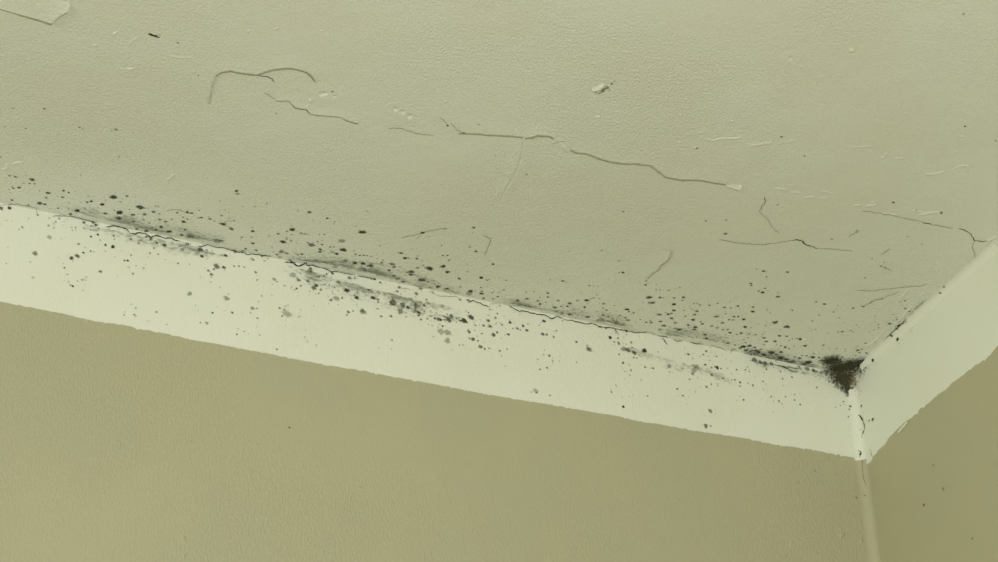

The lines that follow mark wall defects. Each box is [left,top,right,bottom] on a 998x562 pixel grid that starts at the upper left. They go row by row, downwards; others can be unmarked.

peeling [0,0,70,25]
water stain [57,190,263,275]
crack [5,204,376,280]
water stain [277,228,395,271]
crack [724,197,849,251]
crack [865,211,997,258]
water stain [294,245,528,352]
water stain [516,280,874,430]